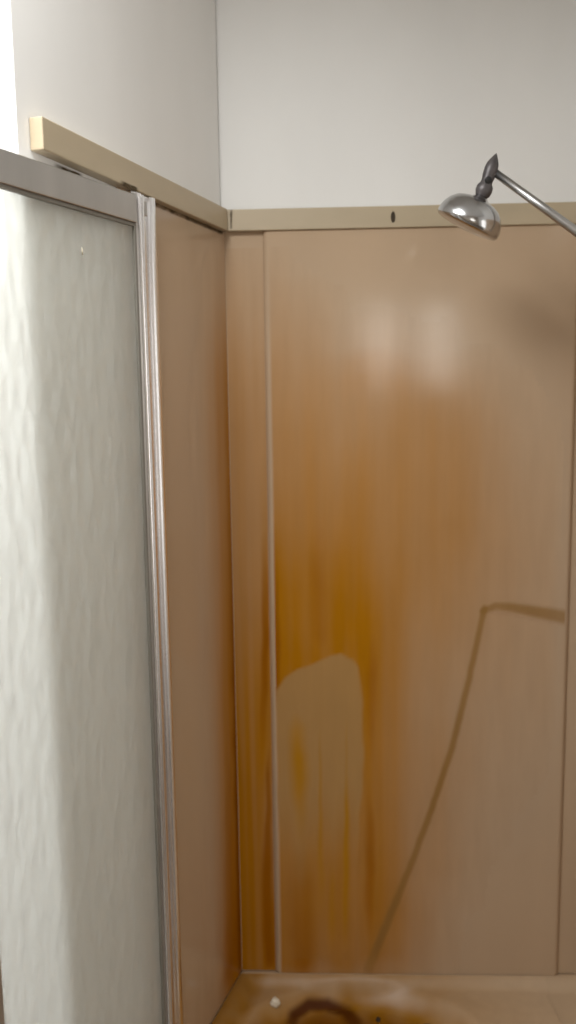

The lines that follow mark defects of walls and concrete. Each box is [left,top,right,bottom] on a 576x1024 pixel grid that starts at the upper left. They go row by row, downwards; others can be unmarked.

peeling [275,650,366,963]
corrosion [189,234,564,1024]